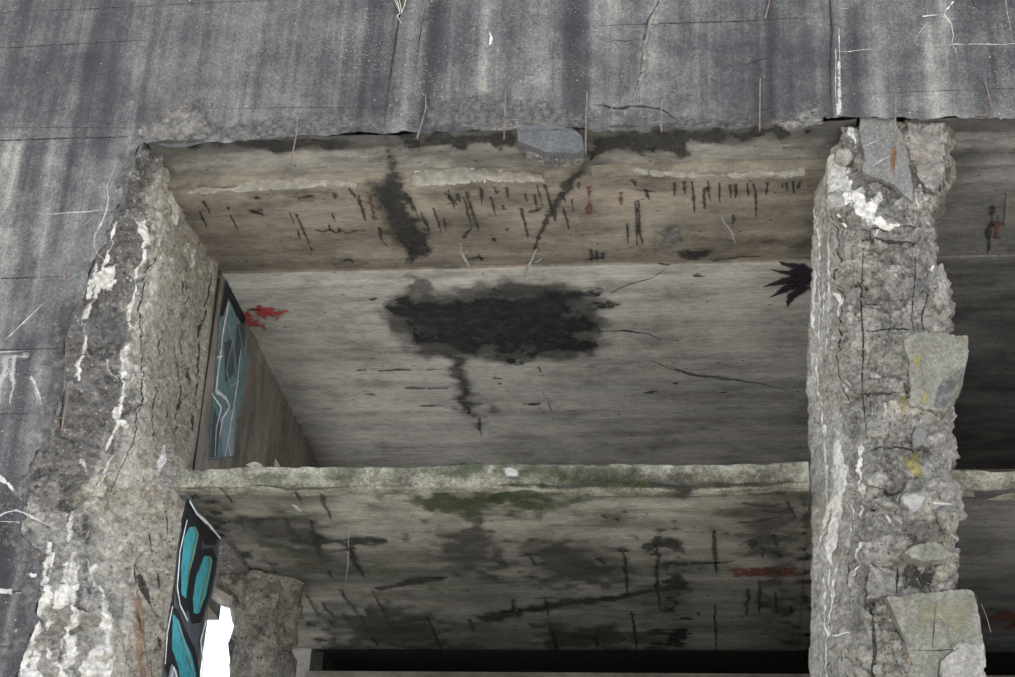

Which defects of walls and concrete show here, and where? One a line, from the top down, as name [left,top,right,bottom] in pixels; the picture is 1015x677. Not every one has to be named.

crack [592,0,867,123]
crack [914,0,1015,58]
damp [188,131,574,263]
crack [523,141,616,279]
spalling [858,92,949,204]
spalling [83,305,131,358]
damp [75,192,196,497]
damp [383,282,619,431]
damp [468,152,904,677]
crack [831,216,929,470]
spalling [903,331,969,418]
spalling [865,542,987,677]